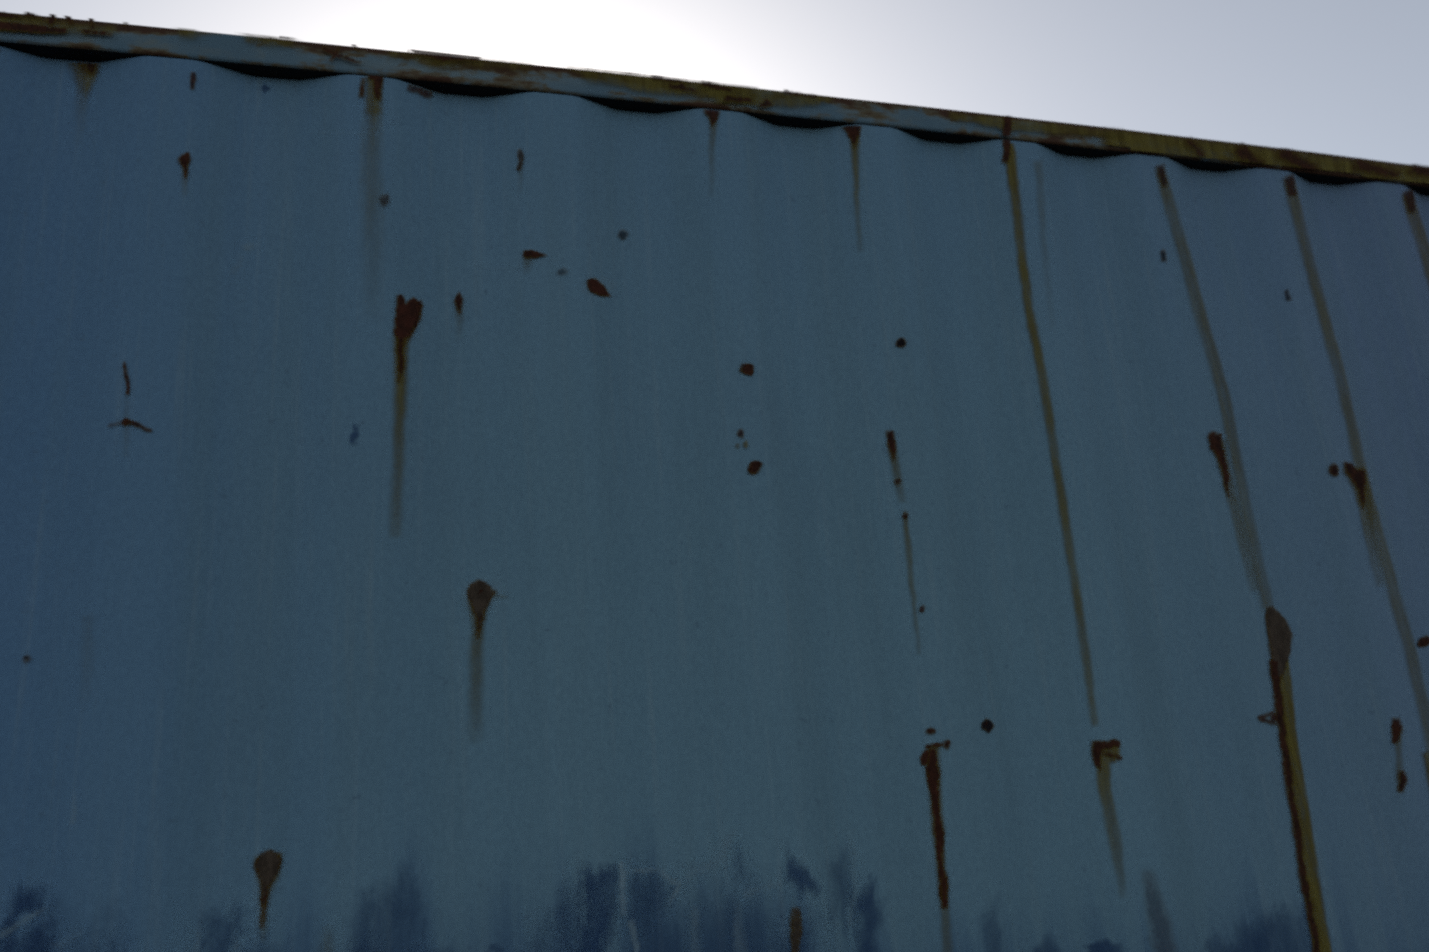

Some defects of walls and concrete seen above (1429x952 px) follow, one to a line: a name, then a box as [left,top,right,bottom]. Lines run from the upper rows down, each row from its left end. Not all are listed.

corrosion [0,12,128,35]
corrosion [322,44,383,109]
corrosion [392,49,480,64]
corrosion [571,66,830,125]
corrosion [587,278,611,296]
corrosion [952,113,1429,434]
corrosion [393,294,423,436]
corrosion [467,580,496,639]
corrosion [1092,739,1122,805]
corrosion [1258,607,1332,952]
corrosion [920,728,950,909]
corrosion [254,849,282,927]